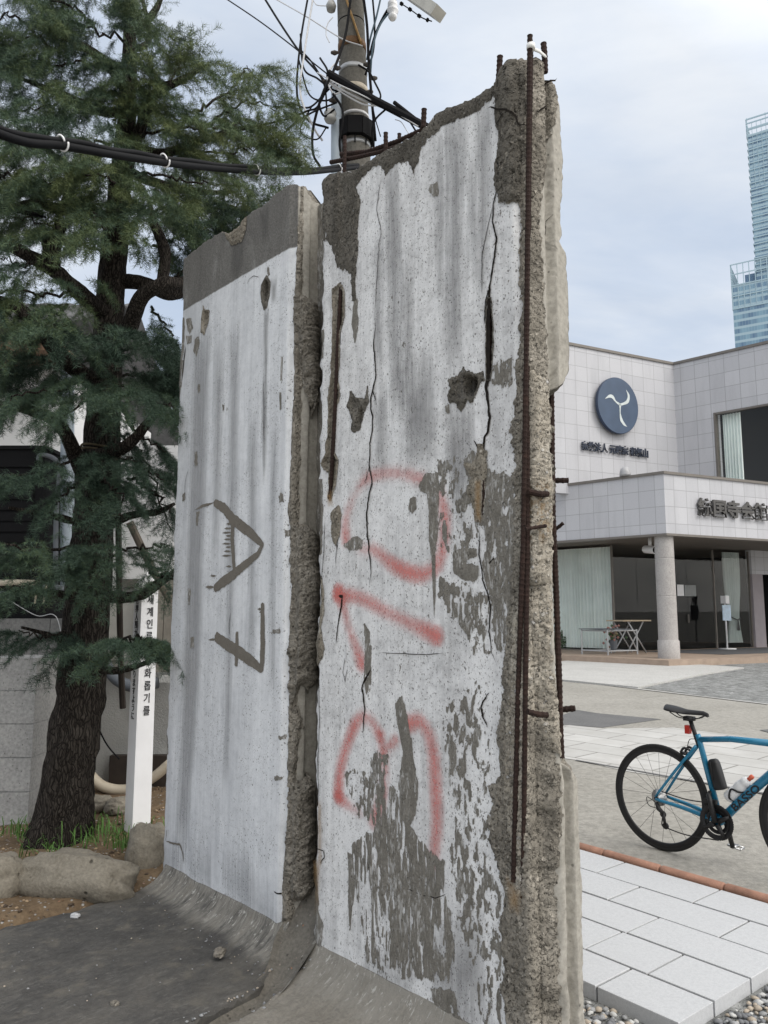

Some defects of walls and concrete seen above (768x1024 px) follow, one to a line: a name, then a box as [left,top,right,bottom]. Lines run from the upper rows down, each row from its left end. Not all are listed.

spalling [225,216,247,246]
spalling [260,267,271,310]
spalling [294,187,304,296]
crack [474,78,557,448]
spalling [278,313,303,536]
crack [365,181,381,585]
spalling [319,34,576,1024]
spalling [316,577,324,665]
spalling [274,694,298,829]
spalling [281,845,295,924]
peeling [314,876,323,947]